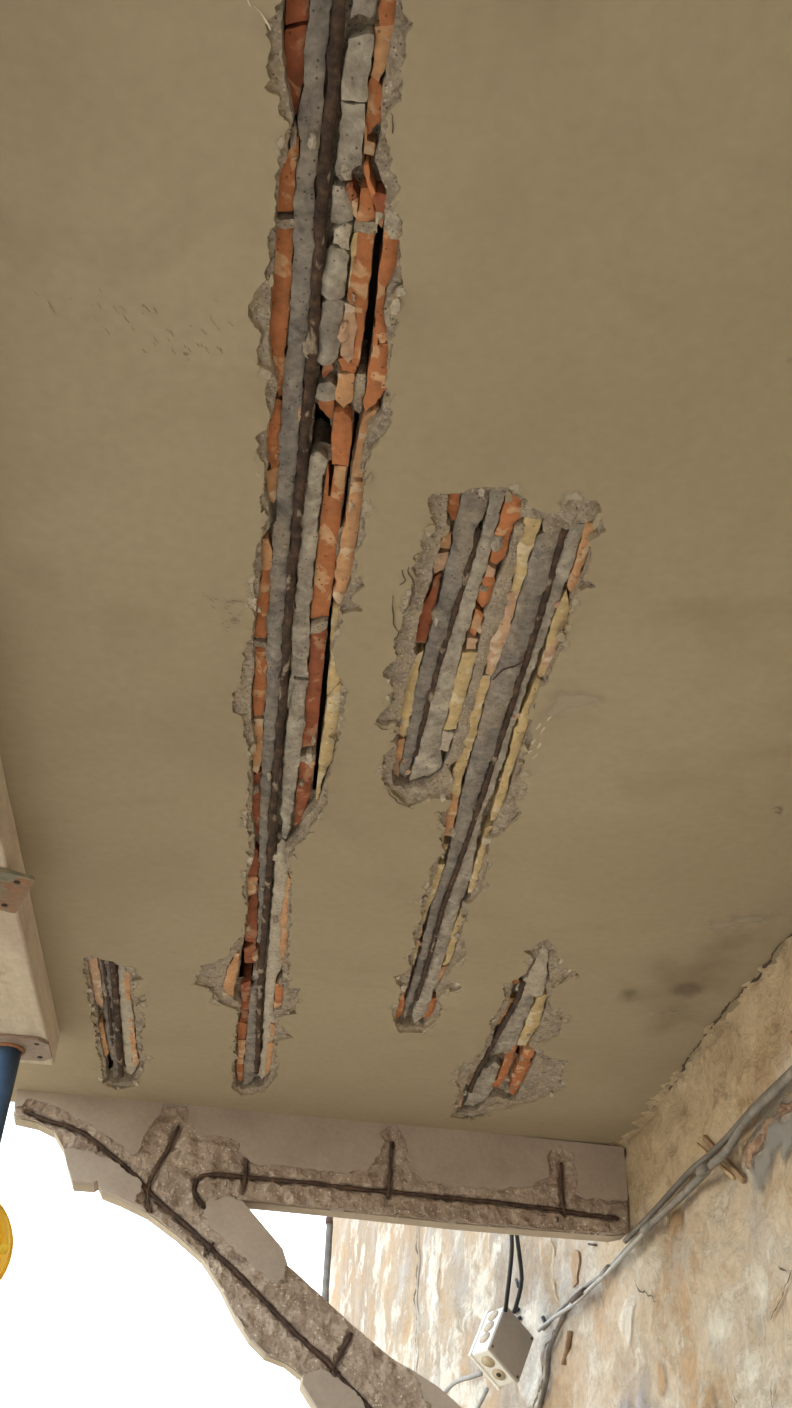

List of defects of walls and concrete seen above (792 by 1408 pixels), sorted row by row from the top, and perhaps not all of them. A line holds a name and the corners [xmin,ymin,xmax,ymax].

spalling [363,210,406,364]
spalling [331,410,364,498]
spalling [230,0,346,1076]
spalling [400,527,569,1001]
spalling [87,960,146,1086]
spalling [453,979,526,1121]
flaking render [743,1092,792,1170]
spalling [13,1099,629,1408]